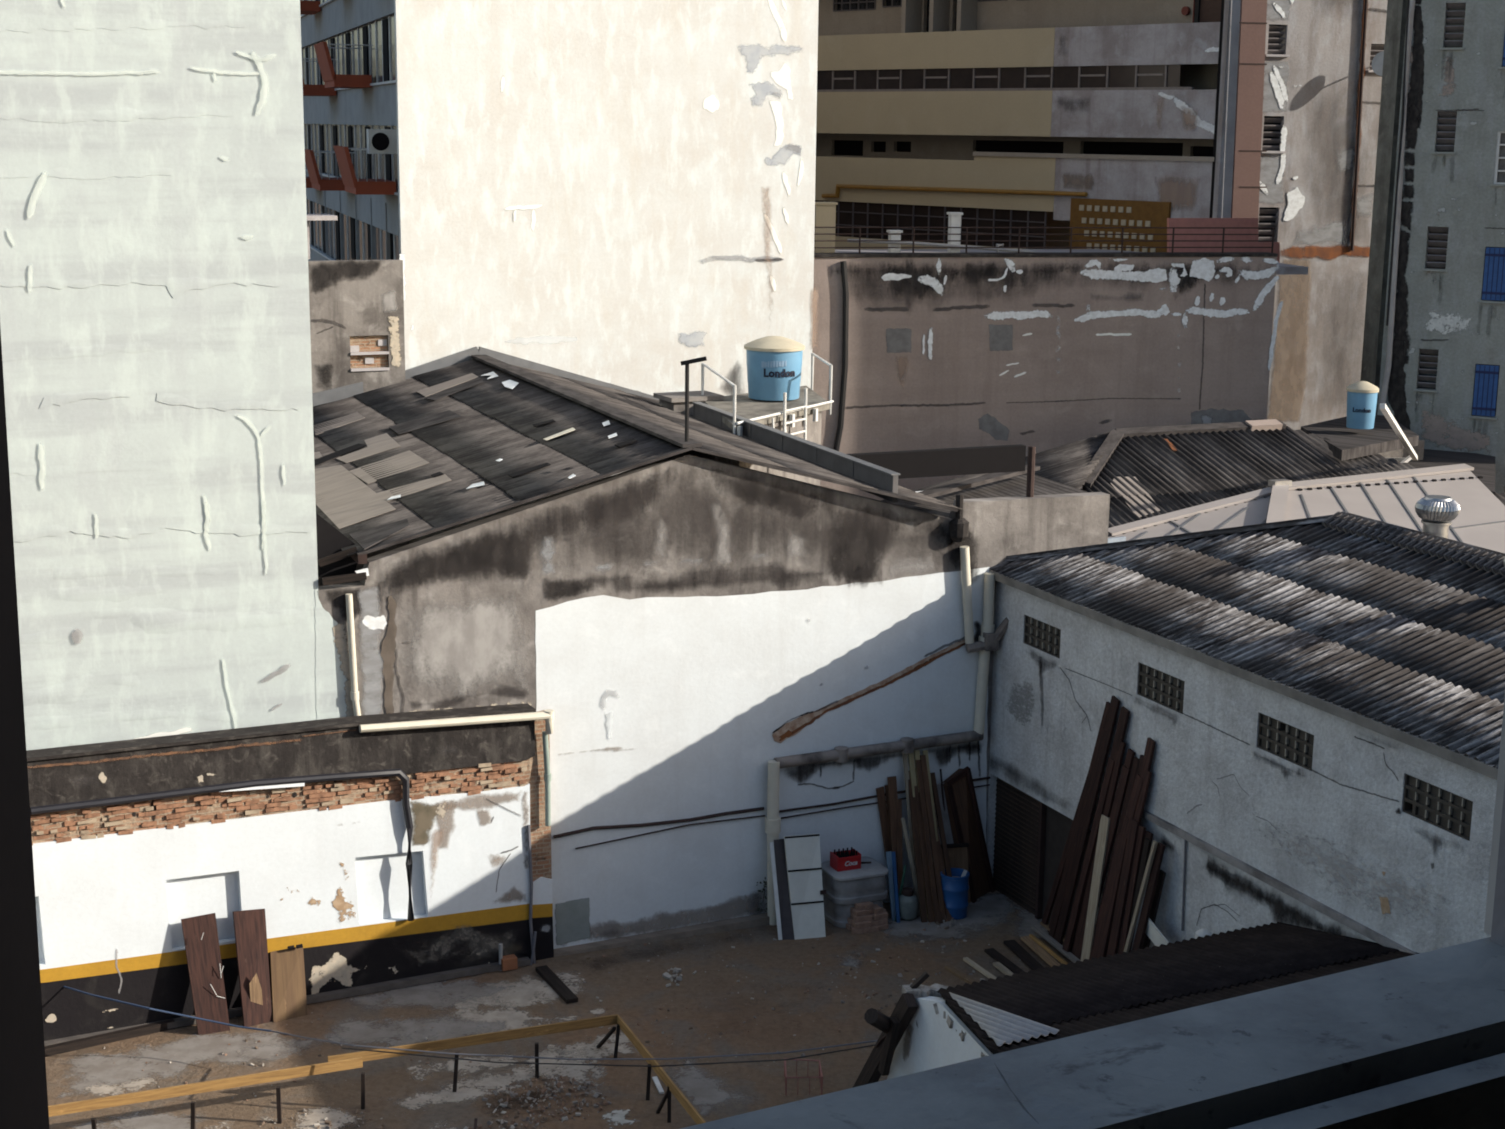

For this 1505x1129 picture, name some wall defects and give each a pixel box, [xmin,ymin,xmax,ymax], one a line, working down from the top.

peeling [1425,311,1478,335]
leakage [391,469,817,598]
leakage [830,509,933,582]
leakage [930,524,977,582]
crack [1060,668,1132,731]
crack [1182,713,1277,830]
crack [1310,736,1399,802]
peeling [411,802,446,867]
peeling [478,811,491,825]
leakage [1206,859,1360,940]
peeling [309,952,367,994]